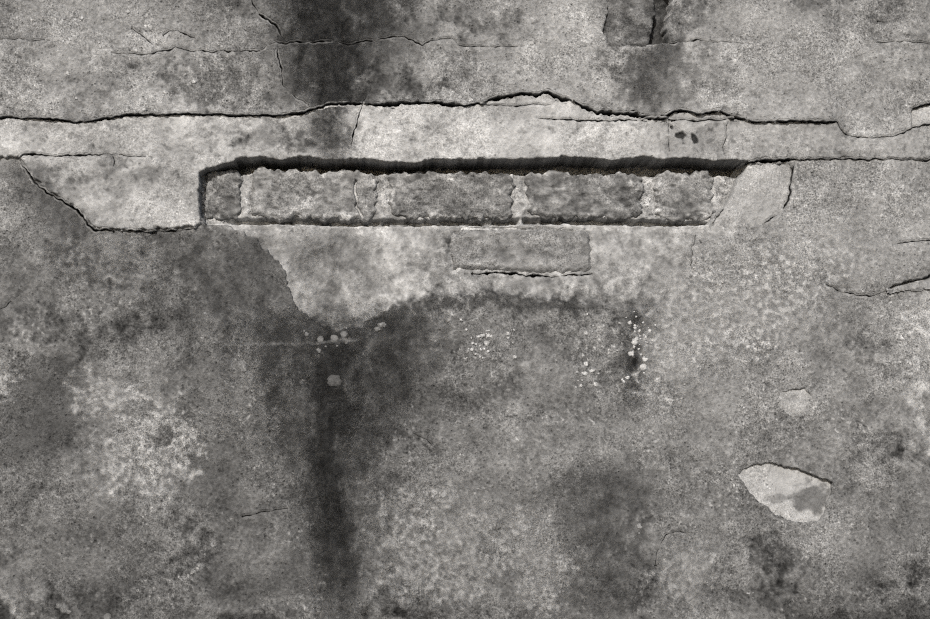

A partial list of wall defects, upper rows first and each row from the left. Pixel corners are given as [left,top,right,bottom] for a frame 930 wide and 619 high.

leakage [286,0,385,140]
crack [0,0,930,234]
peeling [0,96,930,332]
crack [825,283,890,299]
spalling [738,463,831,522]